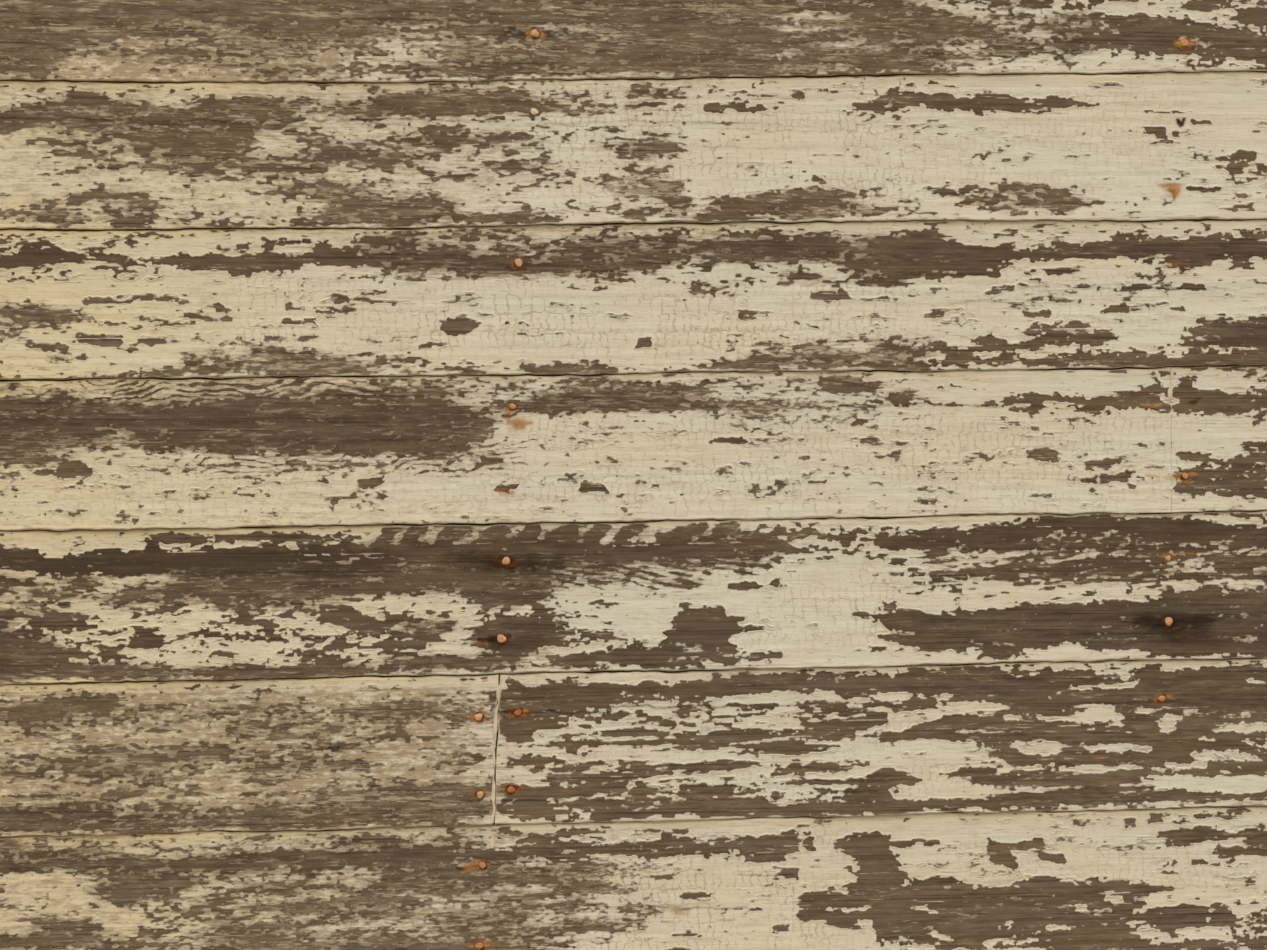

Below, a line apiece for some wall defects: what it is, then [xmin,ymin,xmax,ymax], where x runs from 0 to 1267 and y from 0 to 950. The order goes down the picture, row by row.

peeling [625,82,692,114]
peeling [1129,97,1267,213]
peeling [682,274,773,323]
peeling [0,292,240,367]
peeling [410,291,495,350]
peeling [633,335,657,350]
peeling [554,469,626,500]
peeling [744,459,889,514]
rust [491,557,541,569]
rust [470,635,510,644]
peeling [677,890,727,914]
peeling [770,921,791,938]